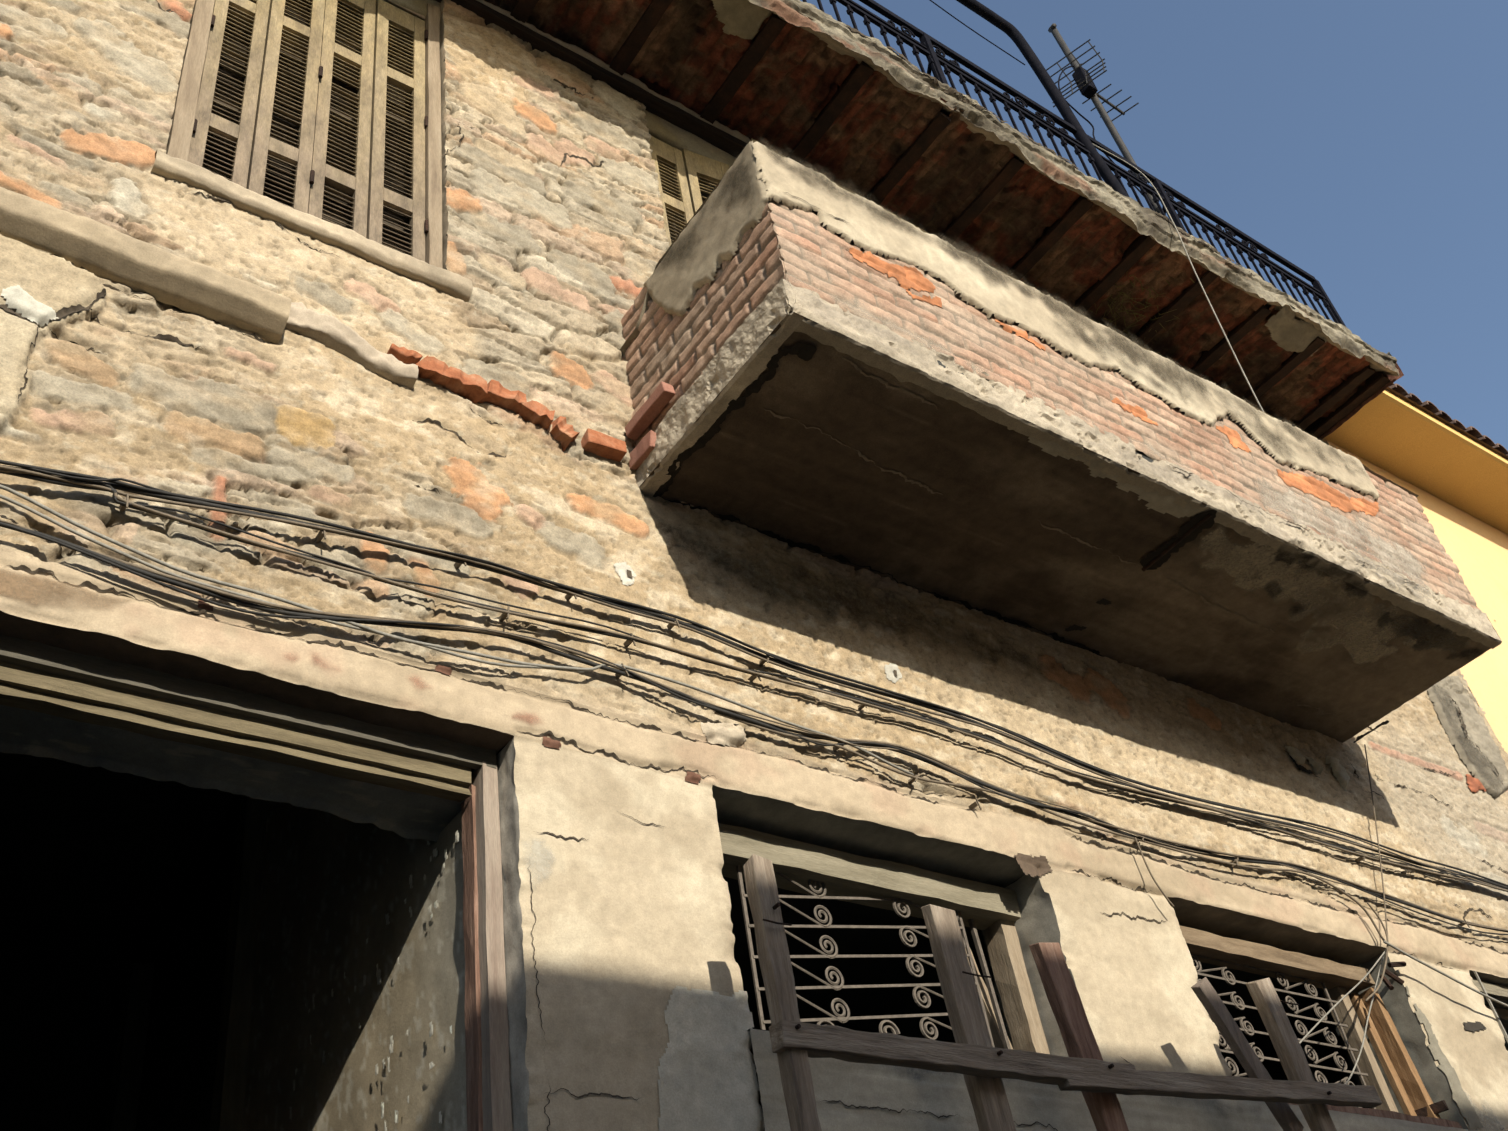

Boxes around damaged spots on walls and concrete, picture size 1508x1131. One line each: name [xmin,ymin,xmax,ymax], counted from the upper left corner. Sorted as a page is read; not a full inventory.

peeling [712,0,772,40]
crack [0,231,275,399]
spalling [845,247,942,308]
damp [943,242,1204,391]
spalling [653,342,817,497]
damp [1225,397,1304,454]
damp [1275,552,1367,597]
crack [7,565,978,811]
damp [1434,685,1501,784]
crack [528,831,586,1048]
crack [1066,834,1508,969]
peeling [657,985,762,1131]